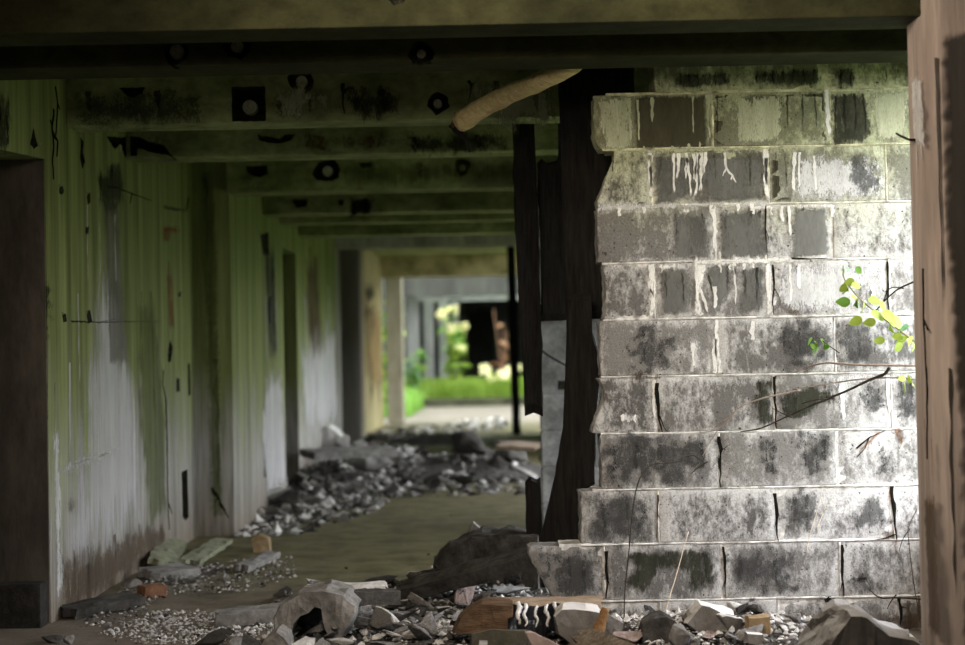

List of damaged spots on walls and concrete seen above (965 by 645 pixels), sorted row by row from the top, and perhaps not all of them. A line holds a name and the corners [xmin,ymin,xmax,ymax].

damp [60,163,165,604]
damp [263,245,286,490]
damp [301,286,338,447]
damp [539,69,924,603]
damp [879,496,940,635]
damp [934,34,965,578]